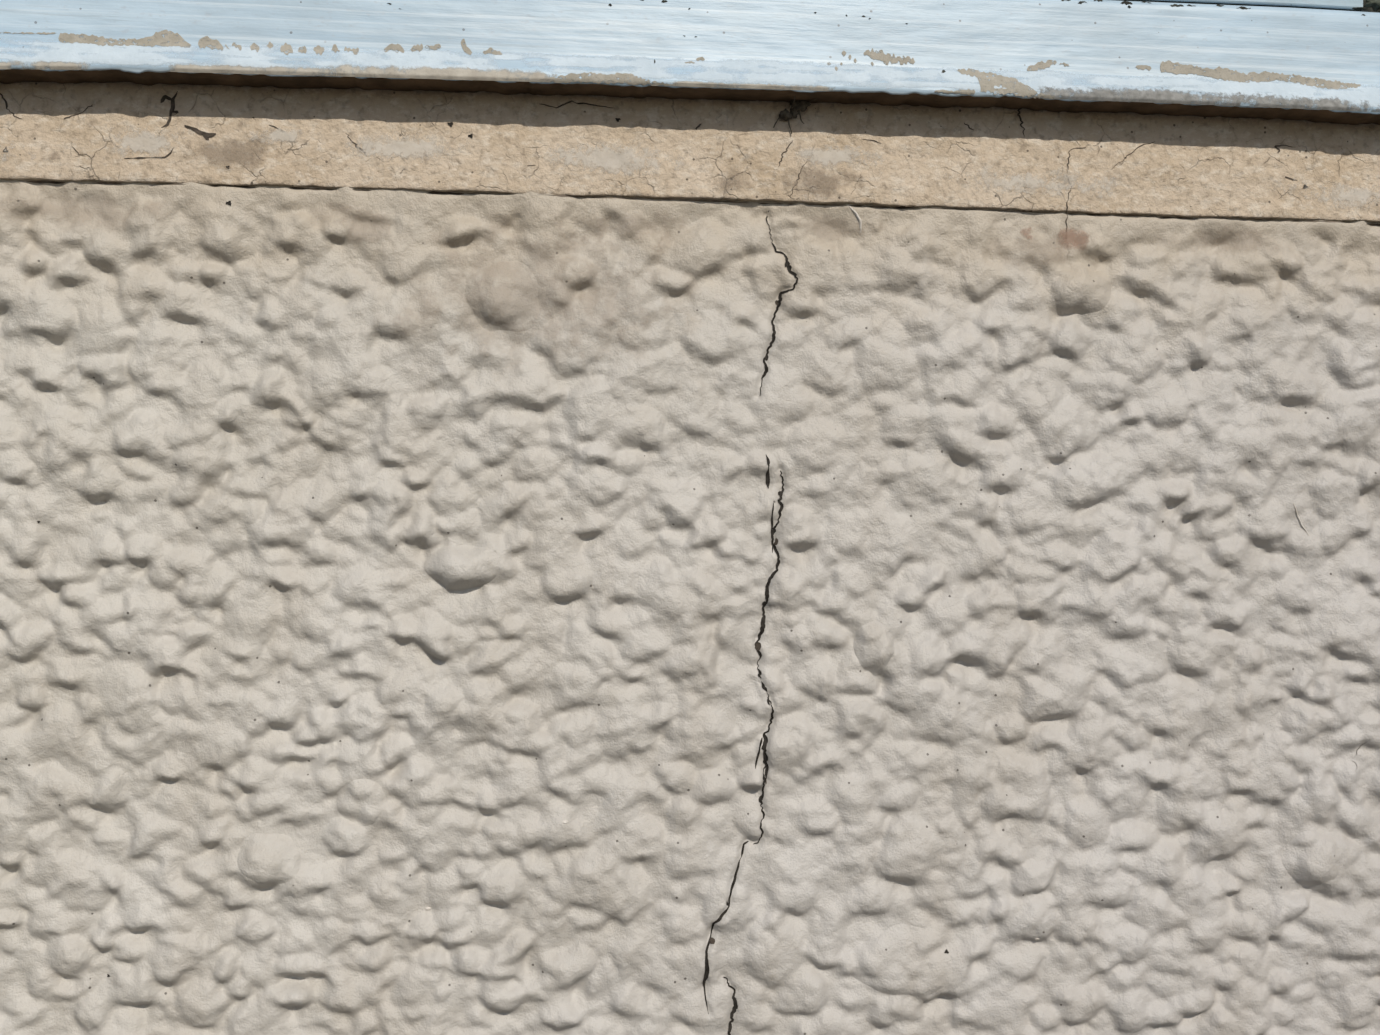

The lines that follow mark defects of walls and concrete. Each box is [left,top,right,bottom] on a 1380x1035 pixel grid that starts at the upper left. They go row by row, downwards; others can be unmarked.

peeling [4,30,359,55]
peeling [384,43,441,53]
peeling [461,39,502,55]
peeling [827,48,915,71]
peeling [539,72,678,86]
peeling [934,60,1069,99]
peeling [1136,60,1361,89]
crack [703,455,784,1035]